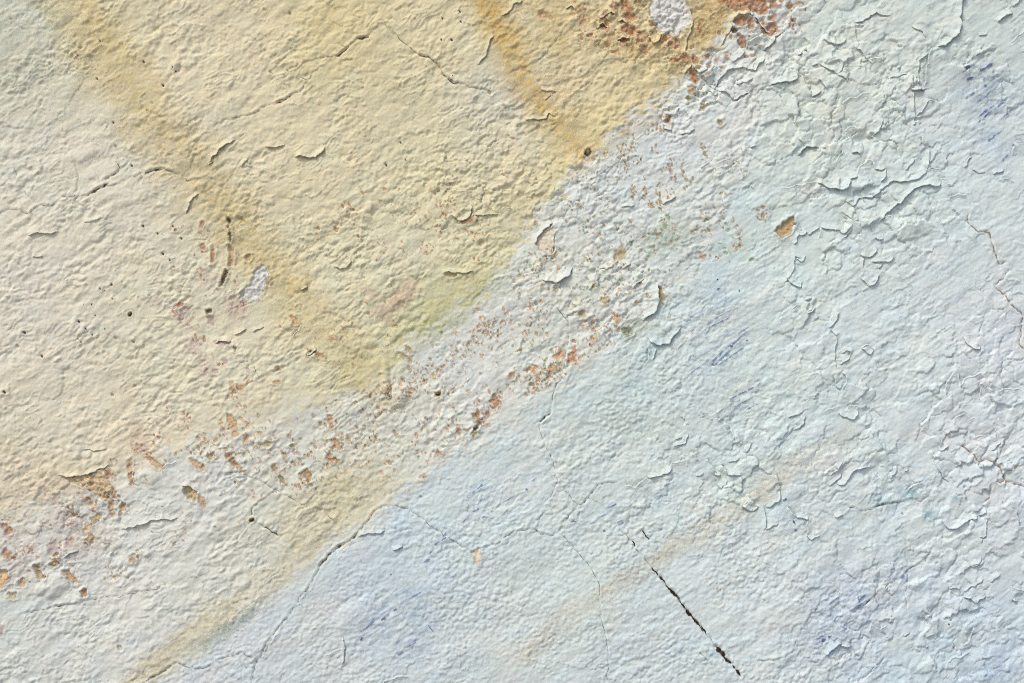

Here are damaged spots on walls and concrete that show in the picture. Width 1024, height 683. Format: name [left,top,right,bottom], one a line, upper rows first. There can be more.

peeling [769,46,850,108]
peeling [888,0,963,125]
peeling [994,0,1020,23]
peeling [775,135,967,322]
peeling [0,0,806,597]
crack [146,308,614,681]
peeling [828,461,870,486]
peeling [942,505,988,565]
crack [622,531,827,675]